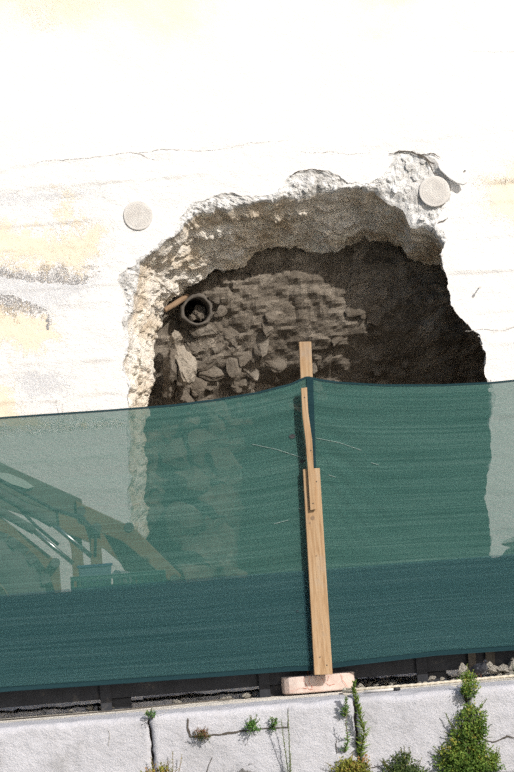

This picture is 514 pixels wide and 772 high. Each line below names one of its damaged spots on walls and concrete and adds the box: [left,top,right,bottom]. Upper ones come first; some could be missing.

peeling [0,183,114,417]
spalling [117,150,492,408]
crack [159,707,289,738]